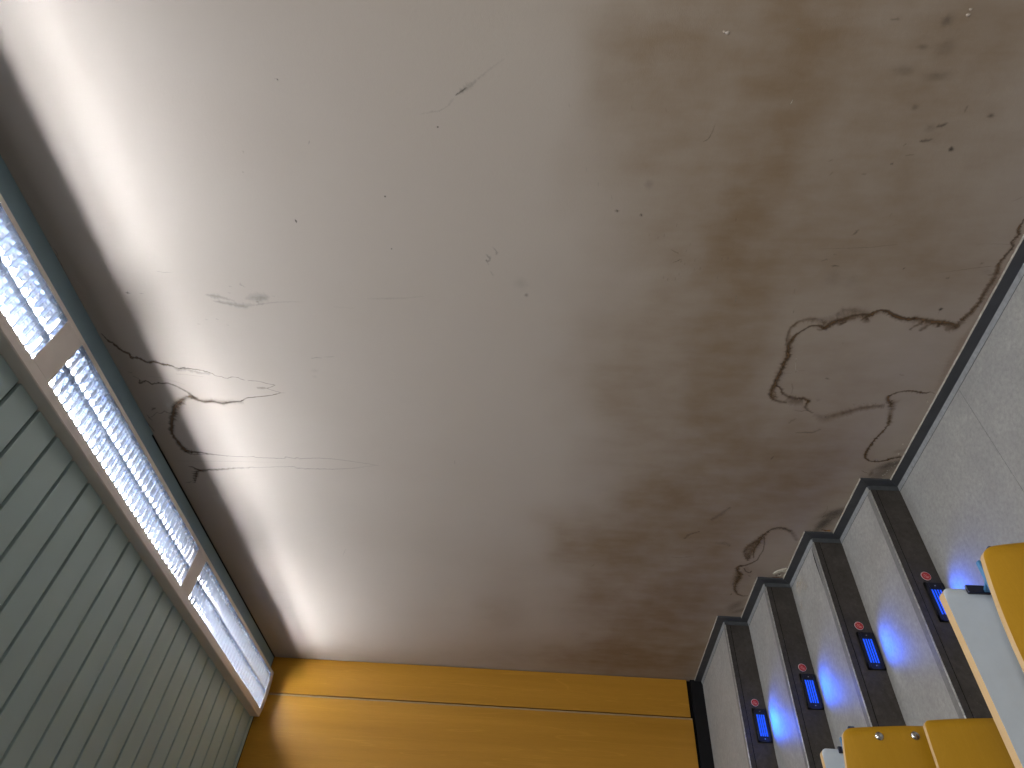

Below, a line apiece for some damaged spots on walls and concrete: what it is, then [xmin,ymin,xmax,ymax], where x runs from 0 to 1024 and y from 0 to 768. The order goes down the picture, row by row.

water stain [769,219,1024,408]
water stain [864,390,929,462]